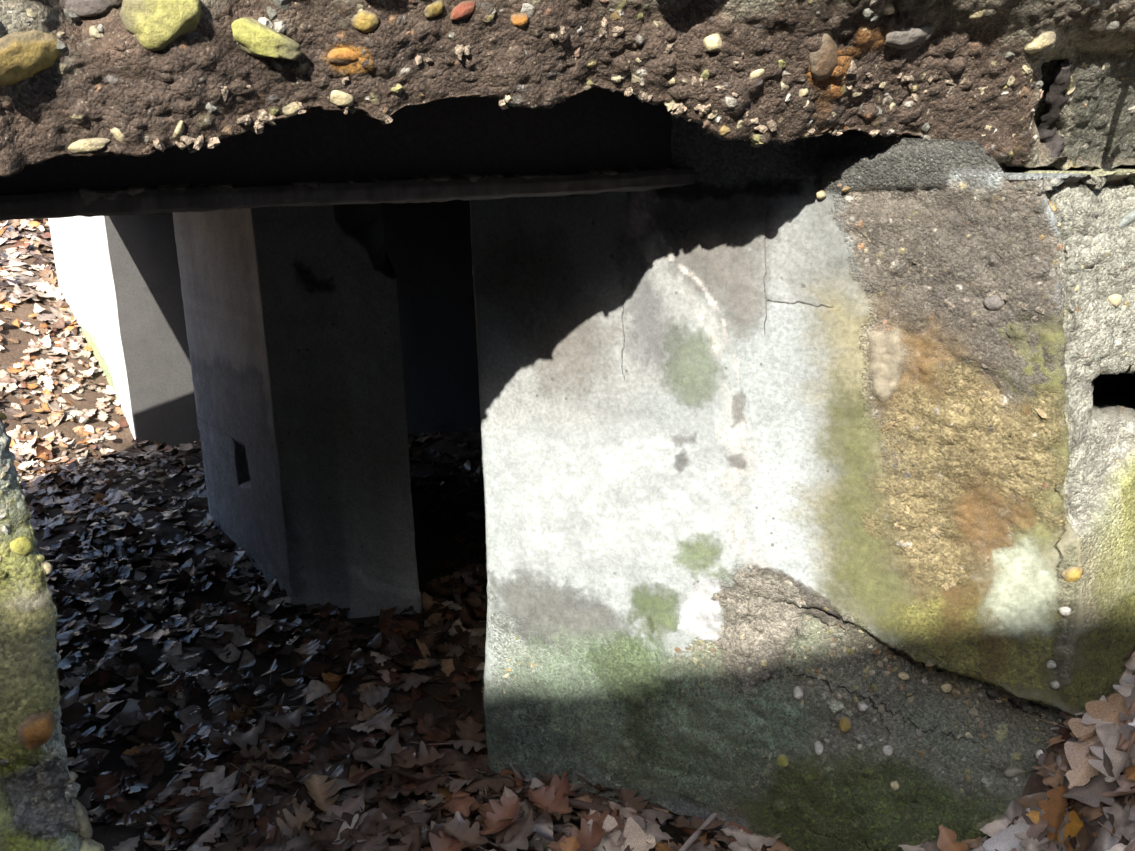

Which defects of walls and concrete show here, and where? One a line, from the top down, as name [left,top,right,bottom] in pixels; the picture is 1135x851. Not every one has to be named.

spalling [5,0,1135,173]
spalling [857,182,1135,596]
leakage [15,593,50,609]
spalling [678,563,860,694]
crack [813,616,1061,717]